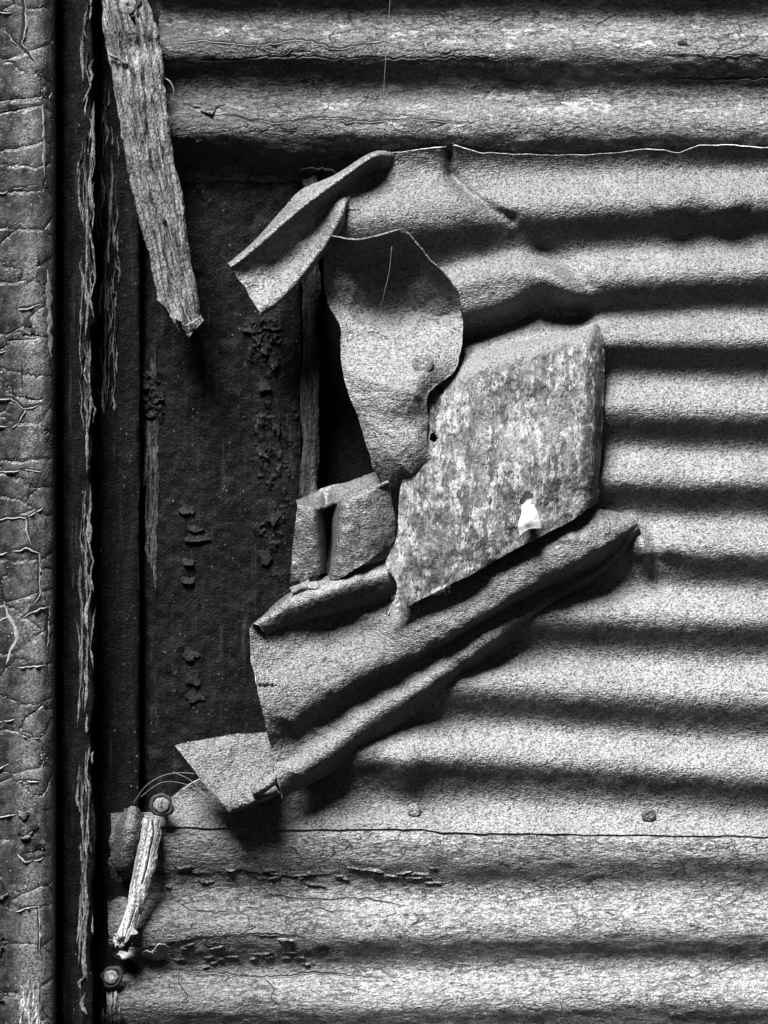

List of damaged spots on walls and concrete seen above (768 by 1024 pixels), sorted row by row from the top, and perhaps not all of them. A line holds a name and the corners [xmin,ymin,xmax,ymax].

crack [0,0,36,62]
crack [0,350,43,429]
peeling [240,313,300,581]
peeling [178,505,213,542]
crack [0,506,51,670]
peeling [180,558,195,585]
peeling [182,647,206,703]
crack [0,762,40,784]
crack [0,812,16,820]
peeling [334,866,441,884]
crack [15,905,42,956]
peeling [202,938,310,968]